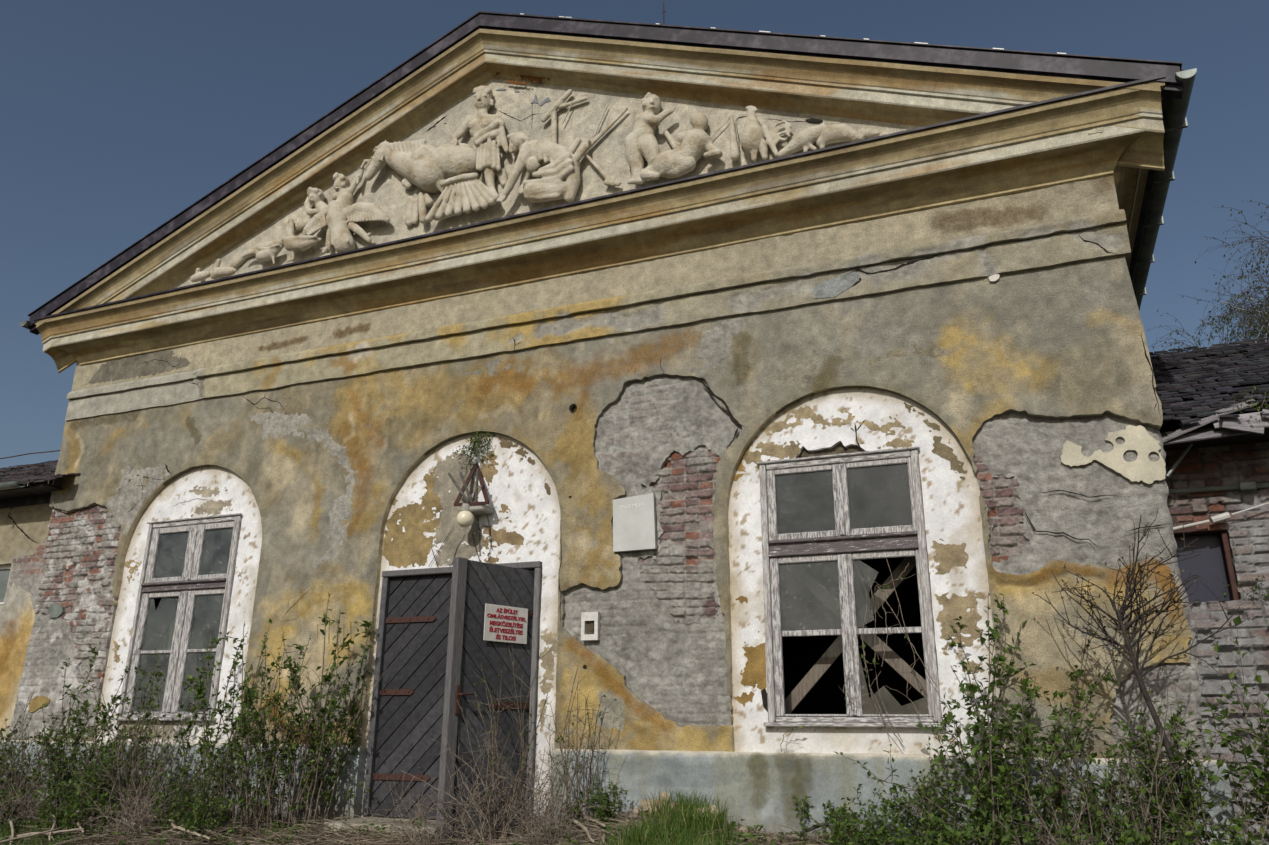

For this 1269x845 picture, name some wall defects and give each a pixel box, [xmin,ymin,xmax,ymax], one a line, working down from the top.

flaking render [8,465,170,738]
peeling [189,485,233,517]
peeling [382,437,535,568]
flaking render [538,317,1209,759]